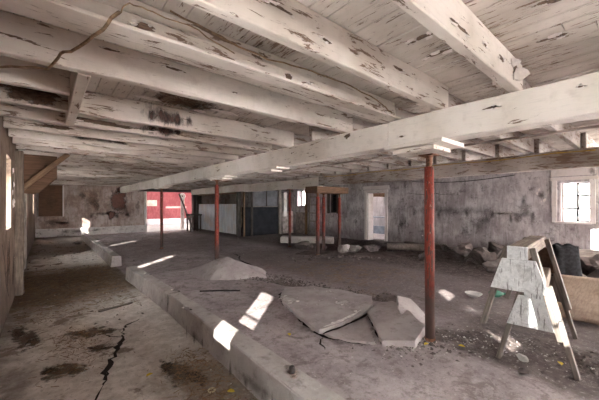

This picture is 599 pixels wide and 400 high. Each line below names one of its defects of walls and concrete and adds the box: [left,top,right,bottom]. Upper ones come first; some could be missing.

peeling [262,0,295,18]
peeling [498,54,530,81]
peeling [134,92,238,116]
water stain [142,108,191,135]
flaking render [109,186,126,220]
crack [298,313,381,348]
crack [95,319,139,400]